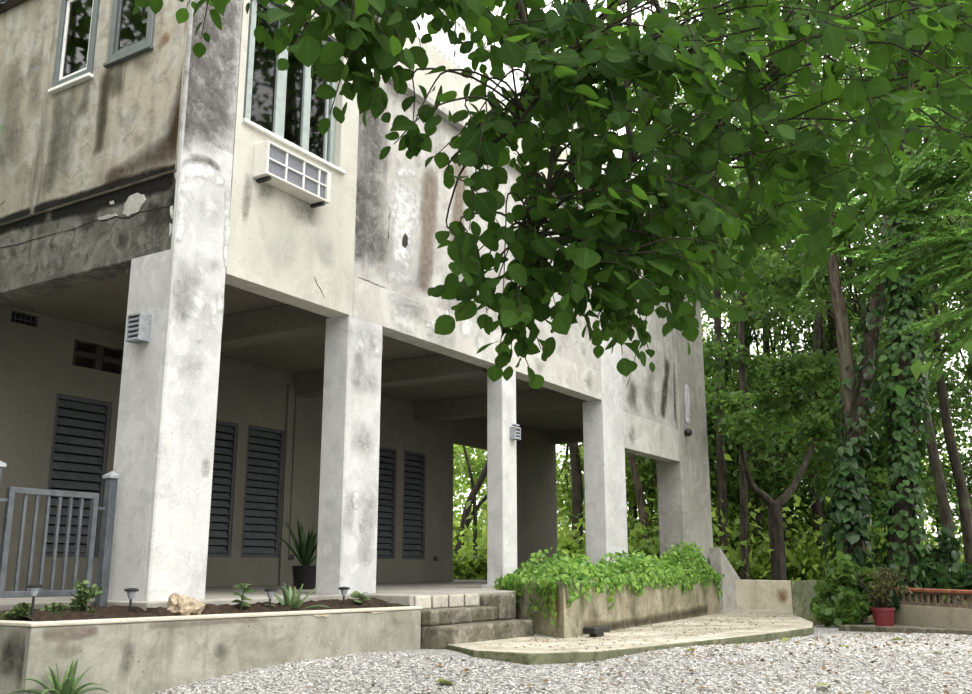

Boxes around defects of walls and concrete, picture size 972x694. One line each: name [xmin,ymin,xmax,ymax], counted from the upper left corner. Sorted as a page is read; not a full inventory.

damp [0,1,237,234]
crack [0,206,165,248]
spalling [98,193,146,220]
damp [355,110,385,259]
damp [420,170,435,290]
damp [661,361,676,416]